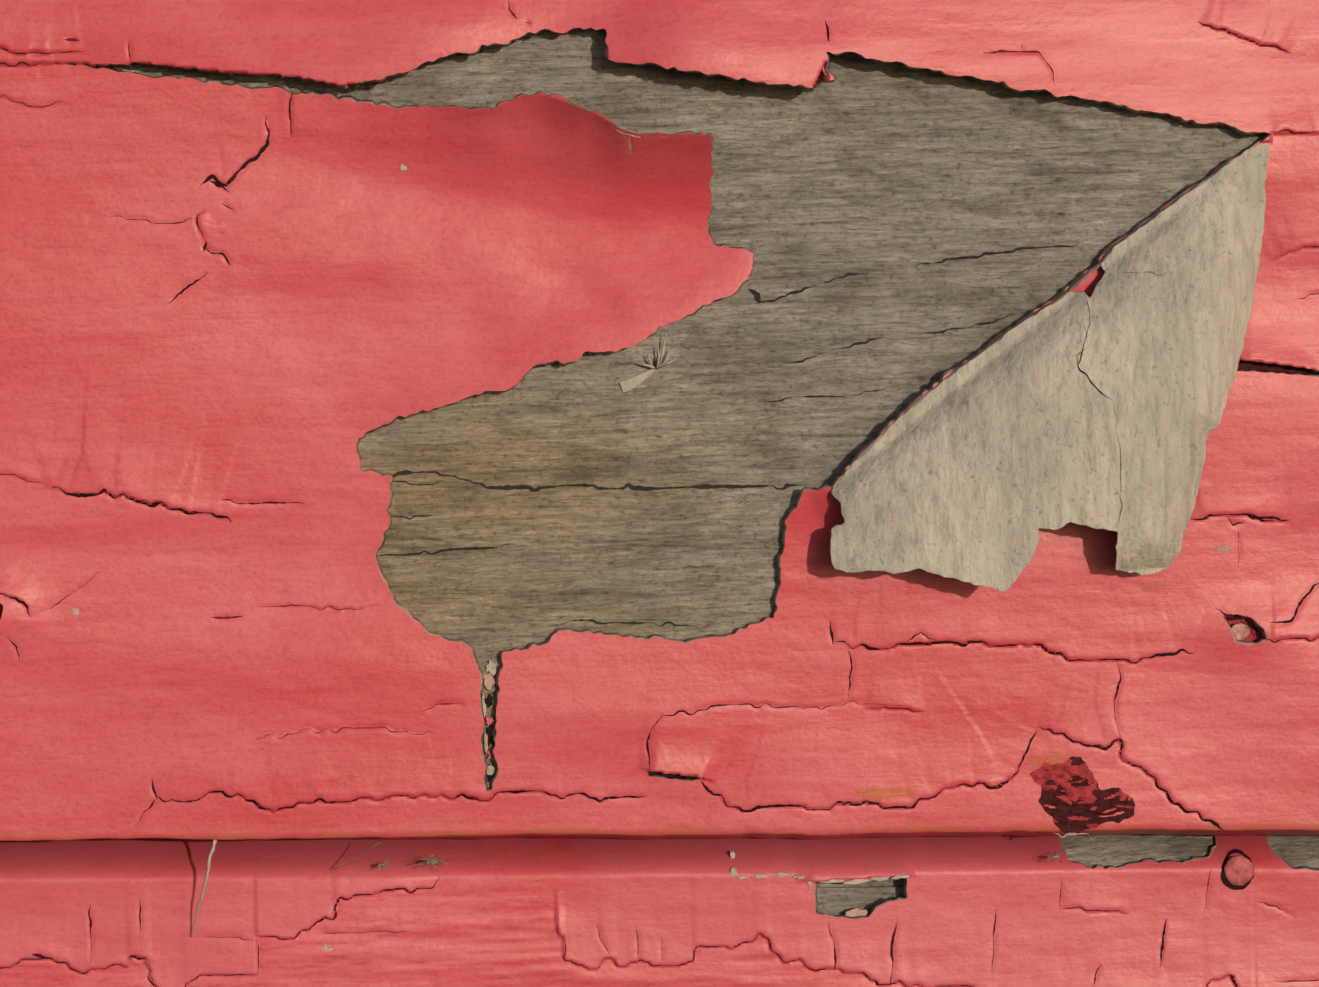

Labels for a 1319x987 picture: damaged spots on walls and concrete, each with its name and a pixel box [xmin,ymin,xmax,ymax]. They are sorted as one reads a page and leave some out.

crack [0,38,86,108]
crack [985,46,1055,85]
crack [1198,21,1290,53]
crack [111,91,293,305]
peeling [56,28,1273,791]
crack [0,474,304,522]
crack [1216,583,1319,643]
crack [133,619,1224,831]
peeling [729,851,910,919]
crack [0,880,438,987]
crack [557,916,996,987]
crack [1159,921,1167,967]